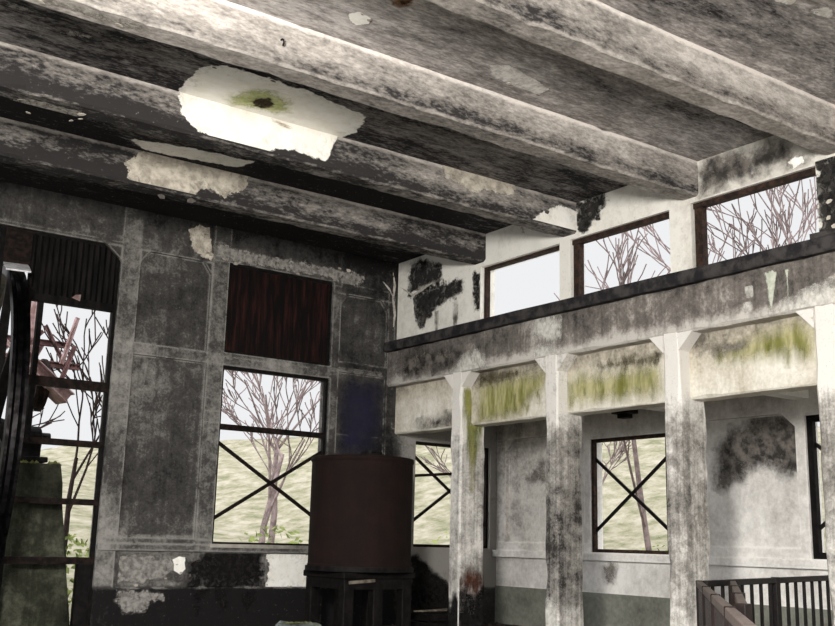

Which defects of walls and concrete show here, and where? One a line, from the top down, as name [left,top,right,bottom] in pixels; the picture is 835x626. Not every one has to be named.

peeling [178,65,366,161]
peeling [124,139,255,203]
mould [576,193,609,233]
peeling [188,224,365,285]
mould [408,258,480,330]
peeling [115,554,185,613]